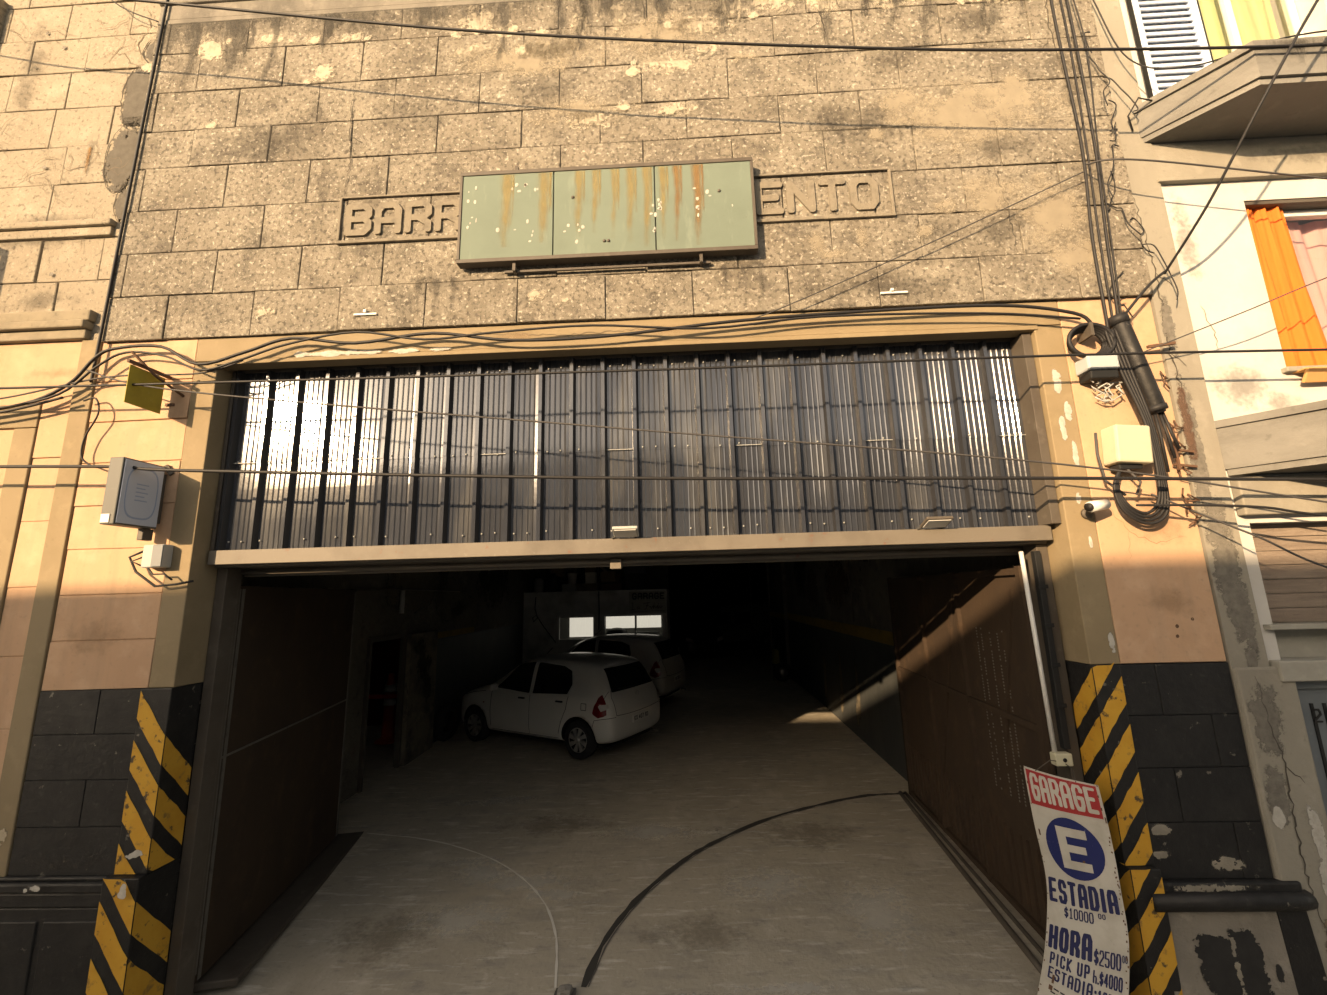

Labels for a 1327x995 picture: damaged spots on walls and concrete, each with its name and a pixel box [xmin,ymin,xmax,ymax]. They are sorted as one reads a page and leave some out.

flaking render [101,39,155,223]
flaking render [1161,297,1178,356]
flaking render [1177,374,1259,667]
flaking render [1247,683,1291,830]
peeling [1175,857,1249,892]
peeling [1307,806,1327,896]
peeling [1192,928,1285,995]